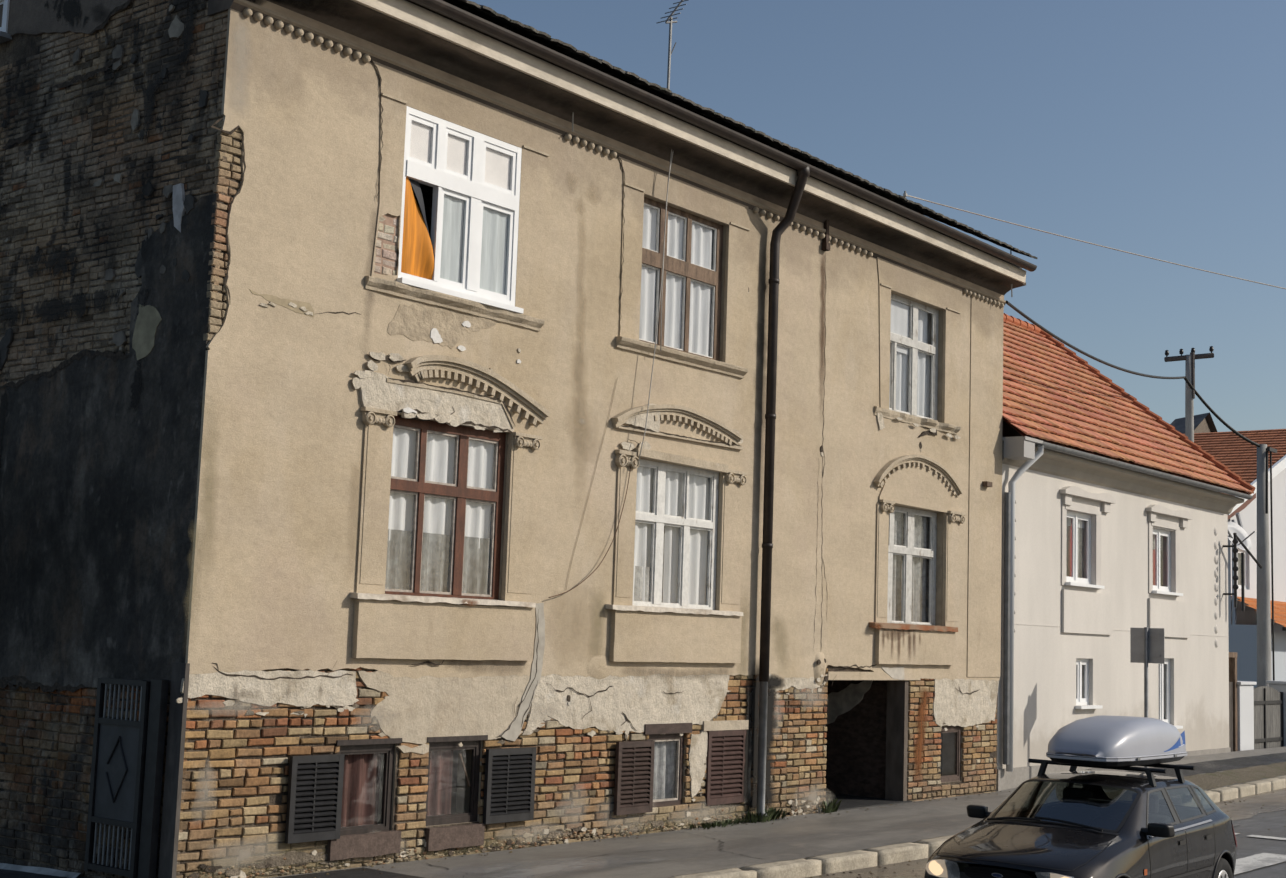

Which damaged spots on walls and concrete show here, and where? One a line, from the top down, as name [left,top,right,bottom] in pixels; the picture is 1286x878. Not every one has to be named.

damp [0,289,153,327]
flaking render [0,0,243,386]
flaking render [374,214,398,275]
spalling [387,302,496,351]
crack [617,156,625,328]
flaking render [352,352,502,432]
crack [813,251,876,684]
crack [498,609,637,737]
flaking render [0,685,150,878]
flaking render [156,665,873,878]
flaking render [907,678,999,802]